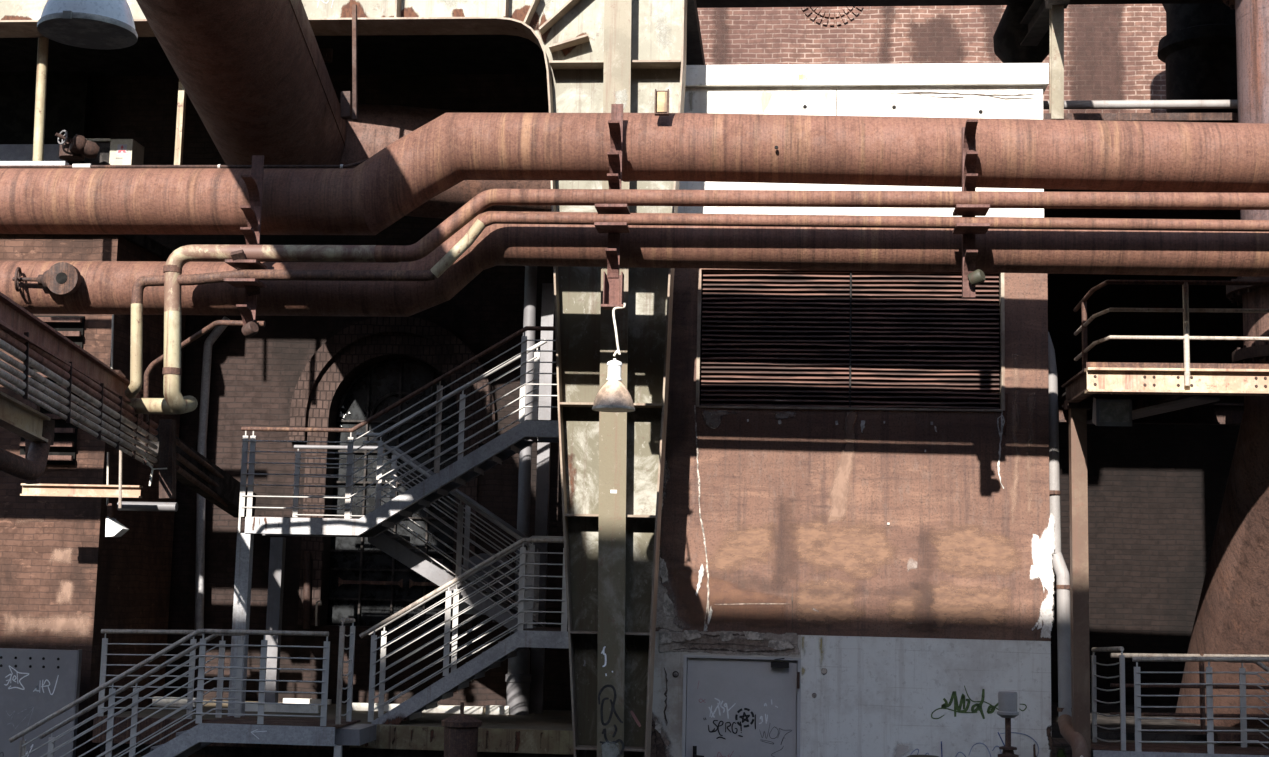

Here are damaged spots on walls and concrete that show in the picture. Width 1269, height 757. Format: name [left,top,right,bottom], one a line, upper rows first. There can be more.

rust [340,0,419,18]
rust [510,5,552,43]
rust [131,189,1269,304]
flaking render [656,551,799,656]
crack [694,405,794,633]
peeling [1030,515,1055,638]